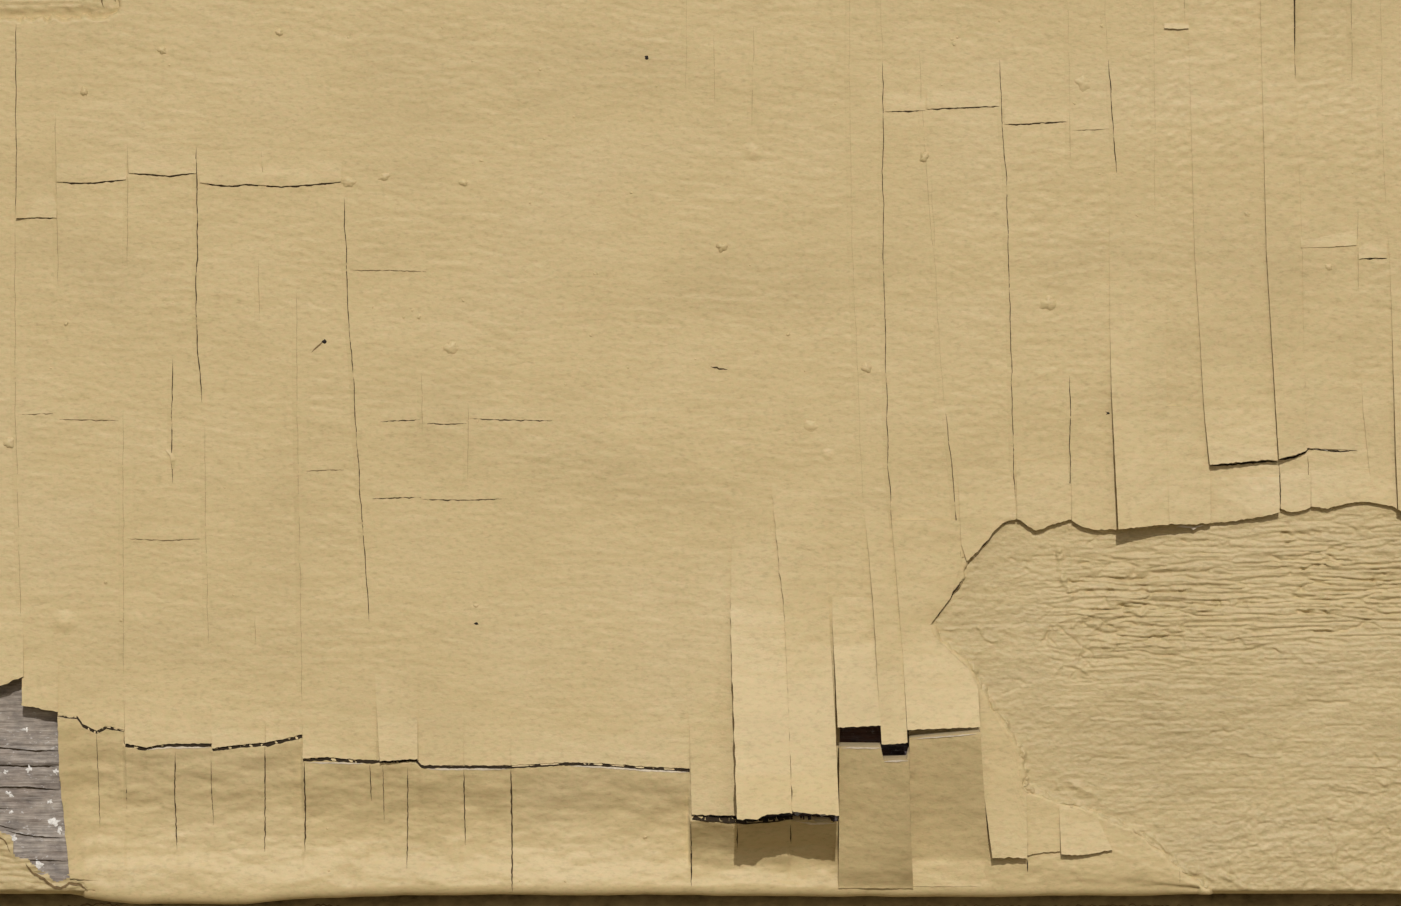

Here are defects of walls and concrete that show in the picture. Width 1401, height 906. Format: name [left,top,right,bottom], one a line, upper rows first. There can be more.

crack [1294,0,1319,80]
crack [1104,61,1130,173]
crack [877,60,1067,527]
crack [1301,223,1387,260]
crack [22,143,381,621]
crack [942,414,974,557]
crack [1064,376,1084,517]
spalling [931,0,1401,894]
peeling [0,470,1112,894]